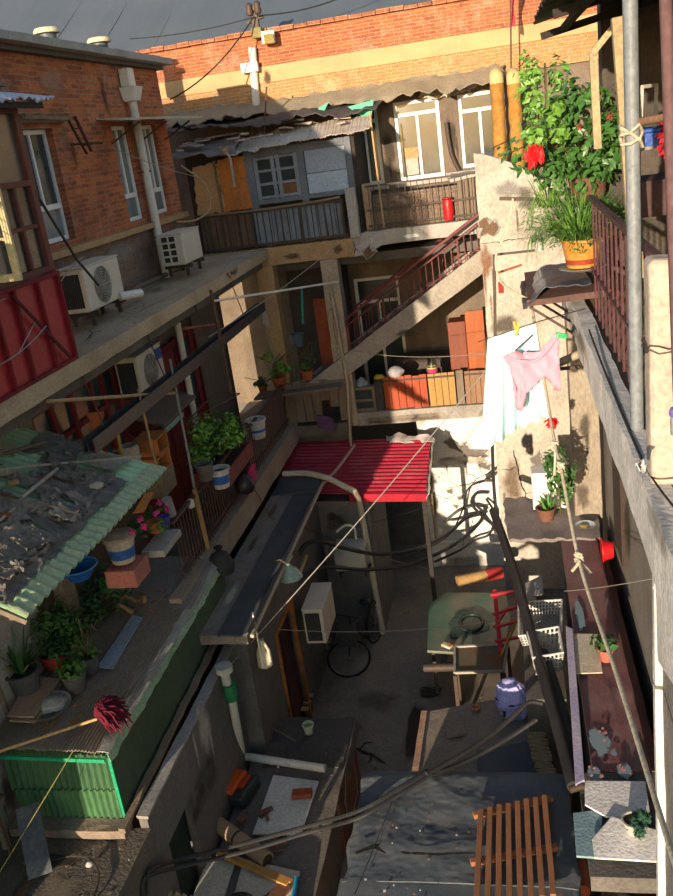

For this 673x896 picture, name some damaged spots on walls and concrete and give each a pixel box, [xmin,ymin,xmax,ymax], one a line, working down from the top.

spalling [477,216,501,239]
damp [193,709,213,763]